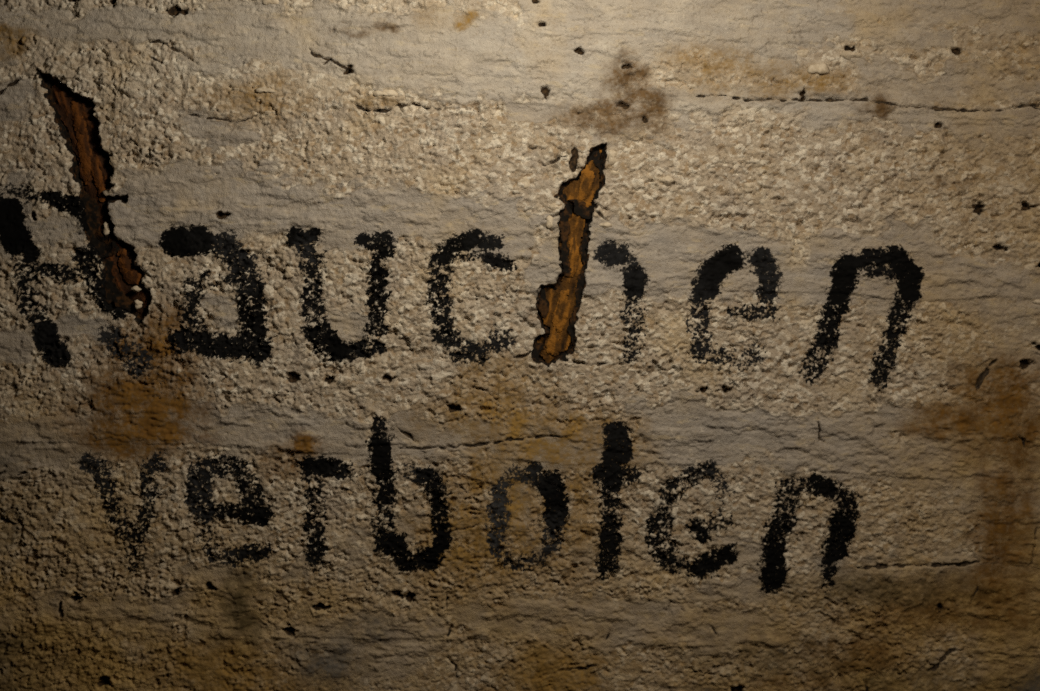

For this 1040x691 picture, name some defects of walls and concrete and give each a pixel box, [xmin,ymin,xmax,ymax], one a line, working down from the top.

spalling [0,34,581,229]
spalling [578,90,1040,260]
crack [696,94,1040,112]
spalling [0,254,34,331]
spalling [140,231,991,430]
spalling [0,440,985,691]